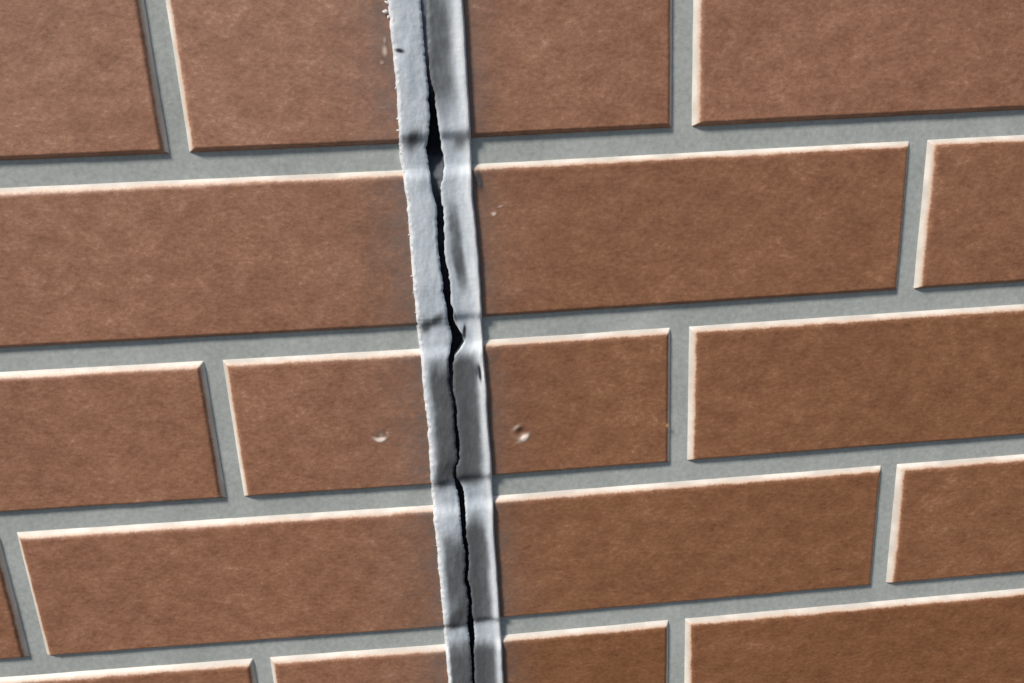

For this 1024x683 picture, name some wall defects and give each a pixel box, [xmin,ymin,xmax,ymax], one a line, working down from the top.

crack [421,0,475,683]